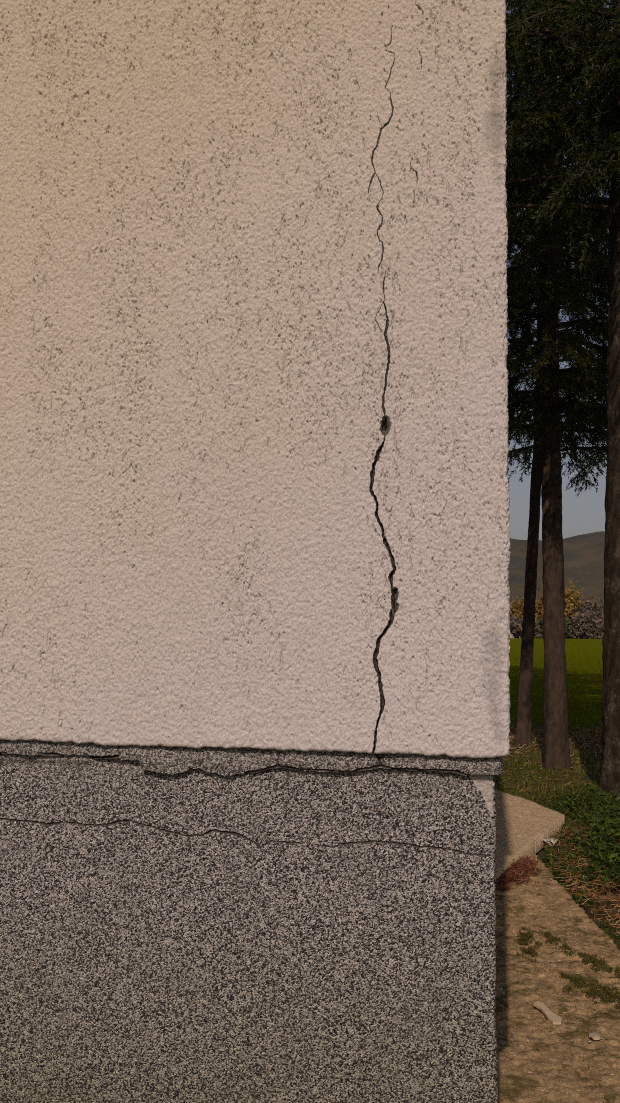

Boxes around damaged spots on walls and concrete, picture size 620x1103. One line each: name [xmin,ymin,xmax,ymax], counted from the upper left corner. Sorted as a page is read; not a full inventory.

crack [235,3,468,776]
crack [40,752,120,760]
crack [0,818,491,856]